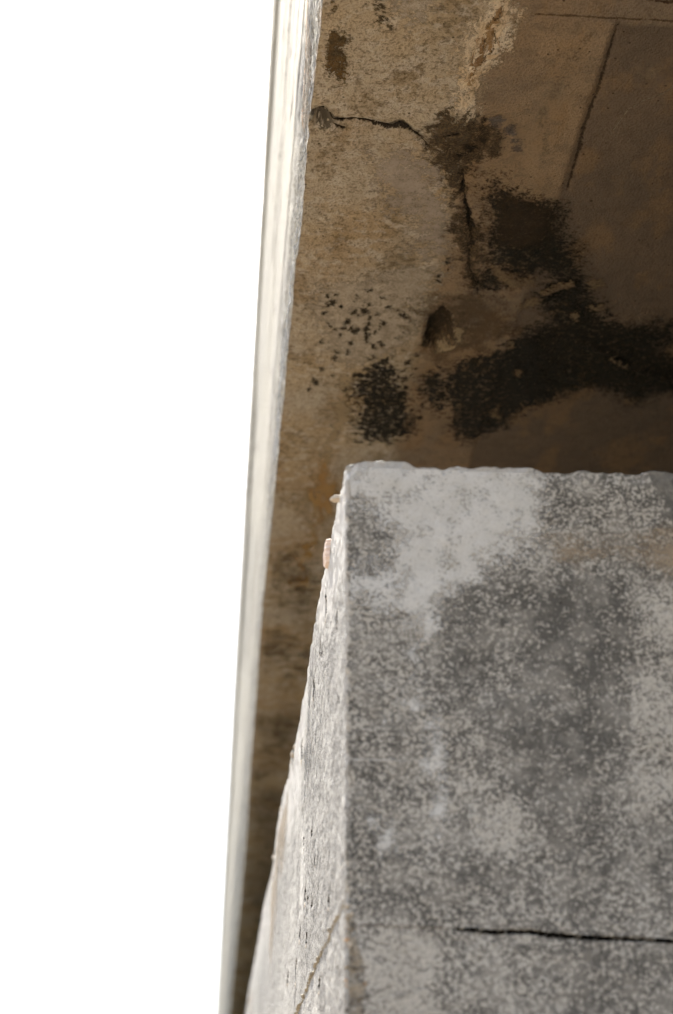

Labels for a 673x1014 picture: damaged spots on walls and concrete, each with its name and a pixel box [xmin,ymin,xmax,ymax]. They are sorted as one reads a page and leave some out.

crack [330,112,499,295]
leakage [320,0,673,464]
corrosion [288,457,340,587]
crack [354,924,673,943]